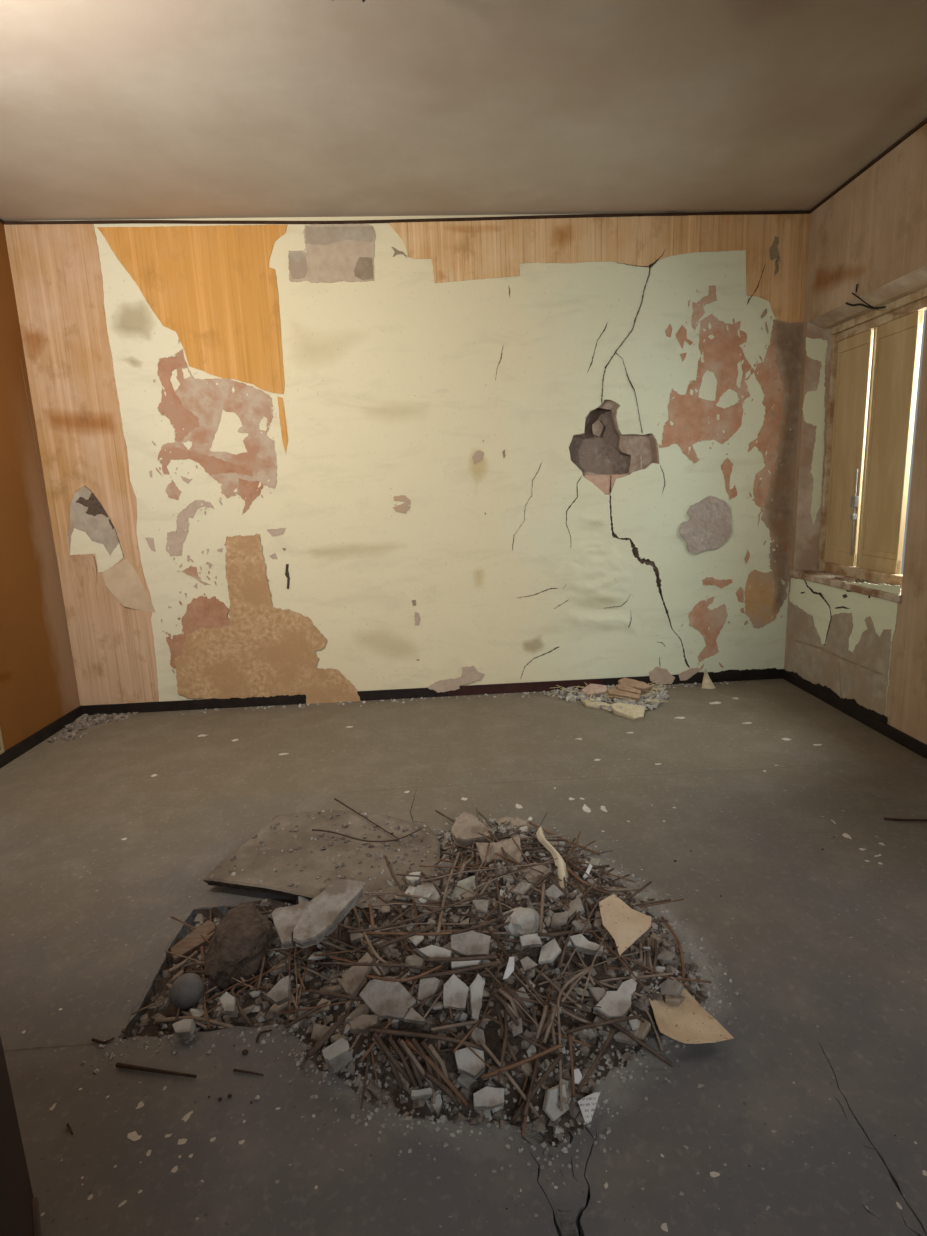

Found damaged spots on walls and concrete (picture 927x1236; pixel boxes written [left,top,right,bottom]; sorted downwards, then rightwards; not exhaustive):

flaking render [288,224,376,283]
crack [588,252,664,432]
flaking render [769,236,781,276]
flaking render [68,486,124,565]
flaking render [145,339,360,704]
crack [566,476,690,668]
peeling [569,285,900,716]
crack [520,1125,597,1236]
crack [819,1043,927,1236]